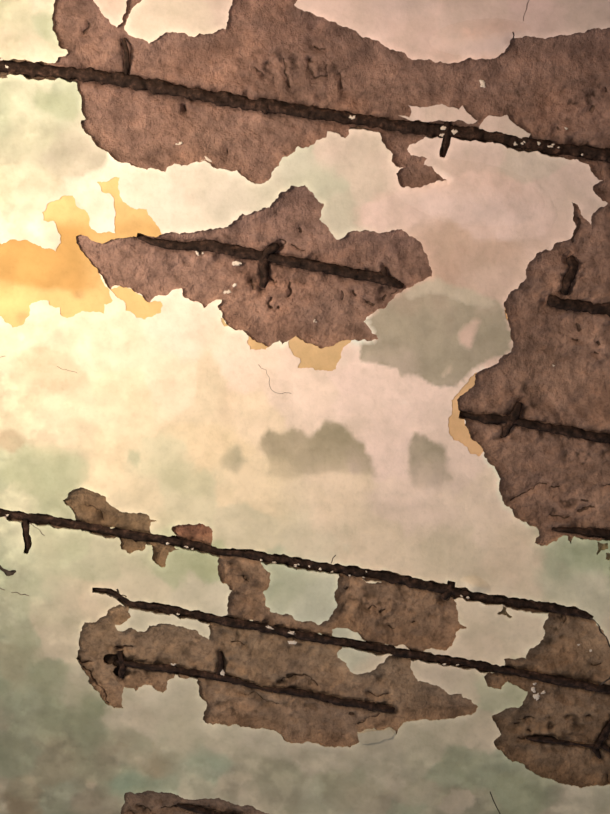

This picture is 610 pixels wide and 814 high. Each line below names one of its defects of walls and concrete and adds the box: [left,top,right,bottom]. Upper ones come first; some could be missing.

spalling [47,0,610,188]
spalling [0,154,610,567]
spalling [77,549,478,747]
spalling [484,612,610,788]
spalling [121,790,269,814]